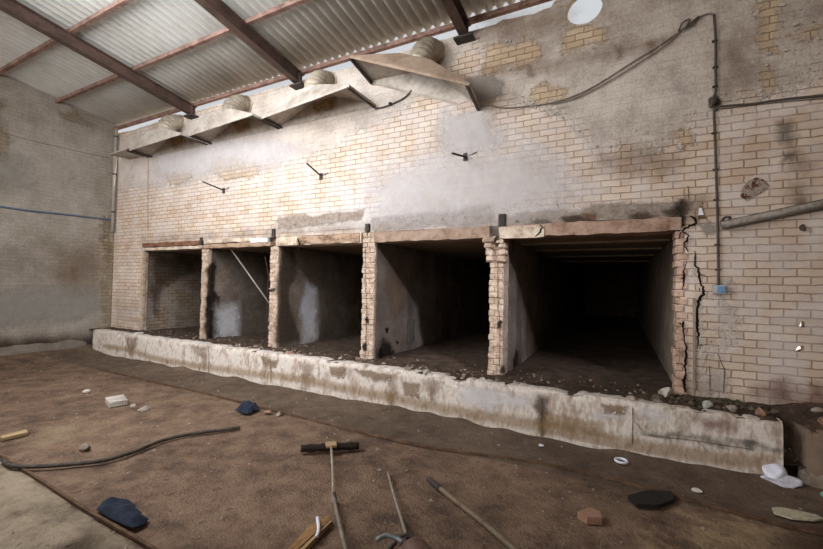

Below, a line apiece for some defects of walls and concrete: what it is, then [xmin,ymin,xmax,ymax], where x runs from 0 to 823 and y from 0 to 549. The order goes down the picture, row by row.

spalling [481,35,542,77]
crack [671,185,725,393]
damp [376,341,394,358]